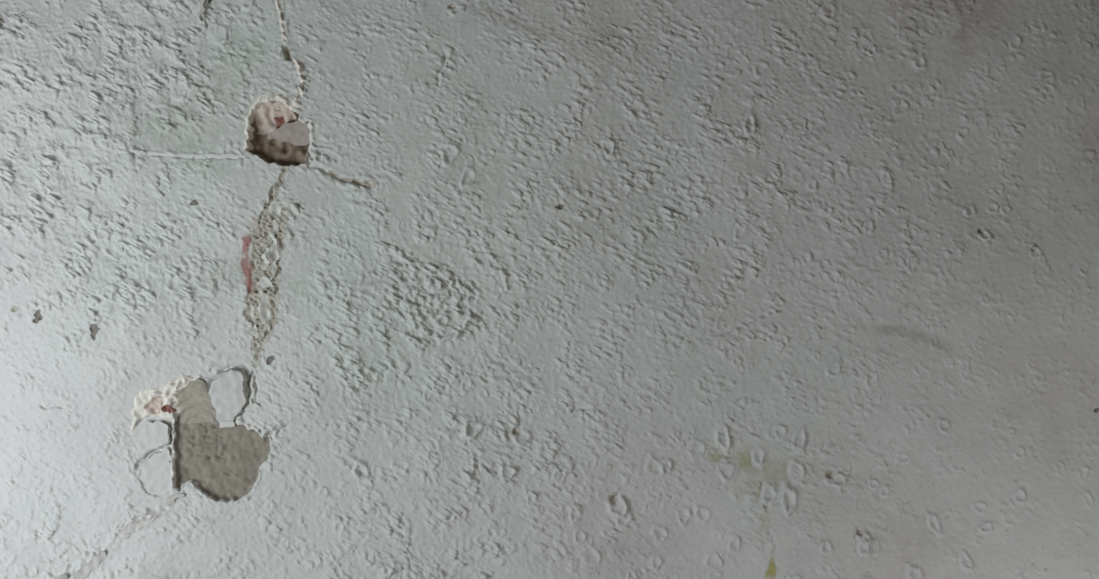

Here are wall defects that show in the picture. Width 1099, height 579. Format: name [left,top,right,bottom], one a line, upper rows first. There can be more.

crack [272,0,309,113]
peeling [243,92,331,369]
flaking render [130,369,296,506]
crack [202,357,263,420]
crack [26,475,191,579]